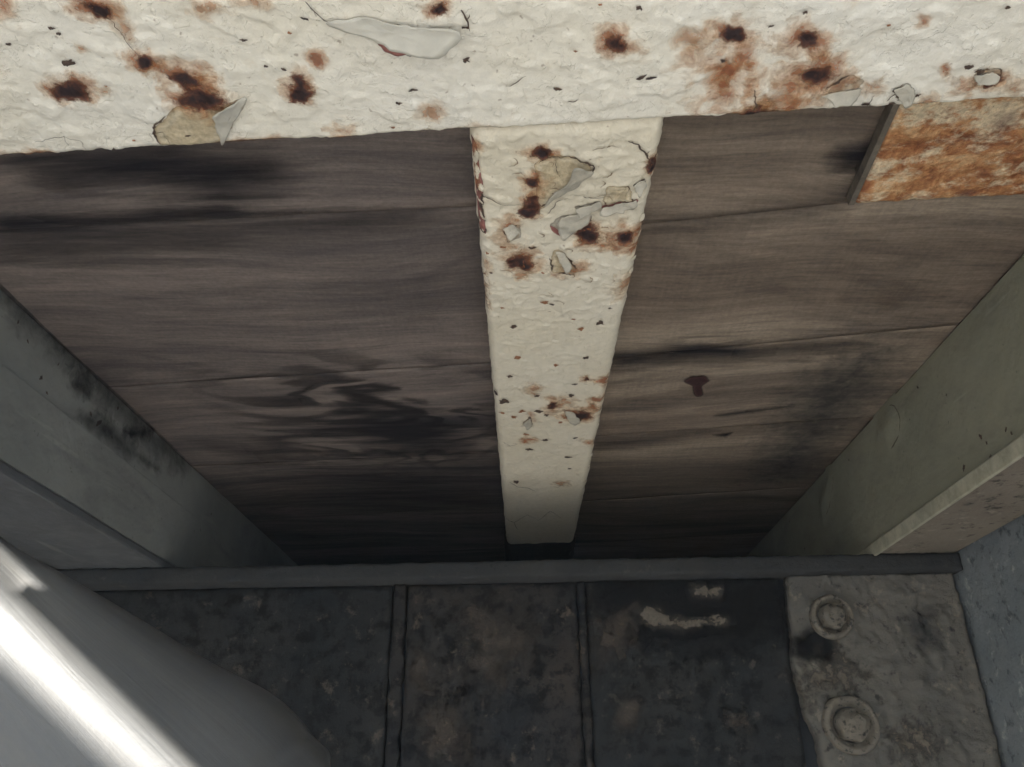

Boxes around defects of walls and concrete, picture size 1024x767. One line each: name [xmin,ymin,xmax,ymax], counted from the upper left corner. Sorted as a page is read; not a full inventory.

rust [42,74,107,102]
rust [127,53,226,118]
rust [286,74,316,105]
rust [676,24,880,115]
peeling [822,75,870,108]
peeling [964,65,1002,89]
peeling [152,97,247,146]
damp [0,152,278,239]
rust [504,171,543,227]
peeling [534,155,595,208]
peeling [541,179,647,275]
damp [253,372,480,455]